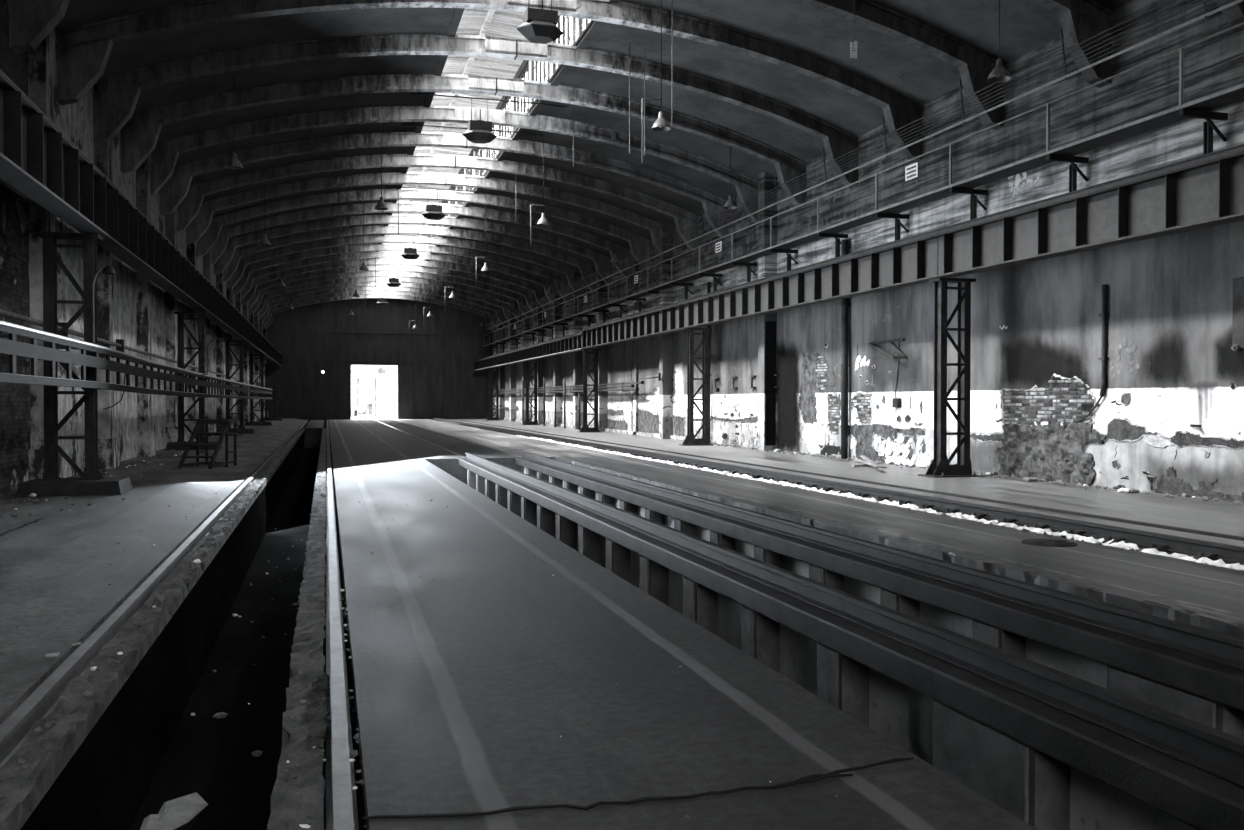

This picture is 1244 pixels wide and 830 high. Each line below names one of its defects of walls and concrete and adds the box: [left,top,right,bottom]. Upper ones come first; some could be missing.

flaking render [799,343,926,467]
flaking render [970,373,1244,489]
flaking render [1142,467,1244,503]